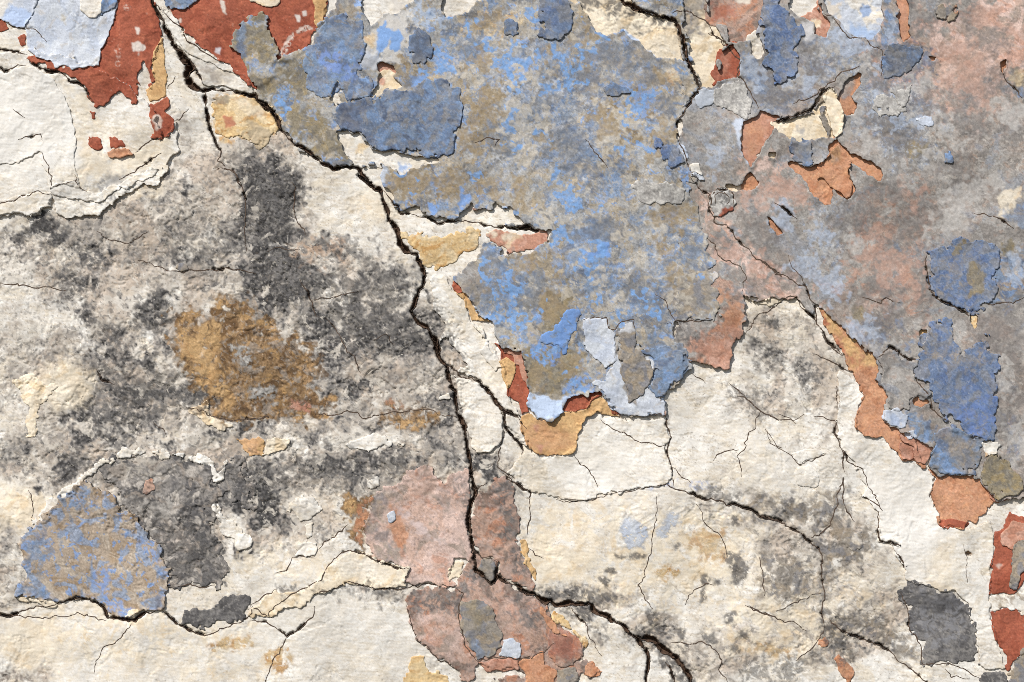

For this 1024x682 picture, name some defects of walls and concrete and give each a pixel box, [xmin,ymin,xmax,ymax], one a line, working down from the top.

peeling [0,0,180,219]
crack [0,0,728,682]
peeling [161,0,1024,503]
crack [556,0,981,682]
peeling [14,480,172,619]
damp [31,446,257,591]
peeling [248,465,602,682]
peeling [835,370,1024,670]